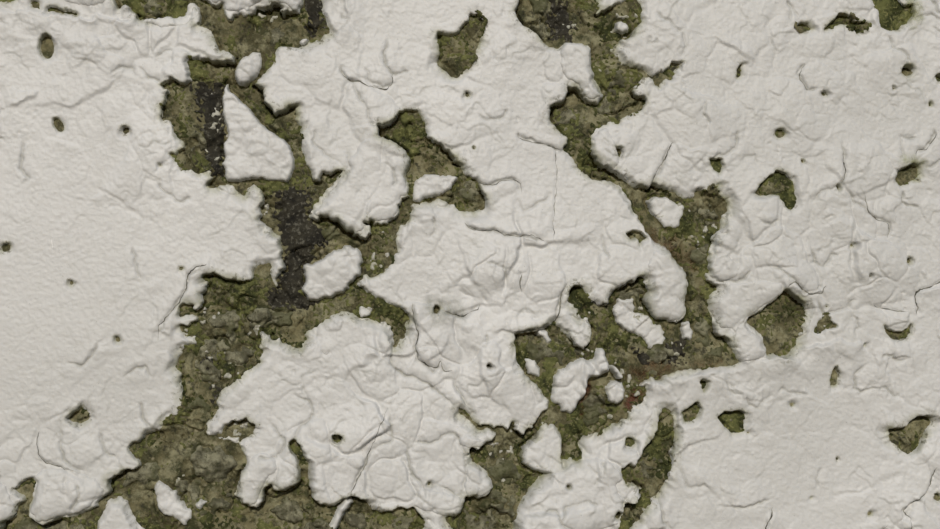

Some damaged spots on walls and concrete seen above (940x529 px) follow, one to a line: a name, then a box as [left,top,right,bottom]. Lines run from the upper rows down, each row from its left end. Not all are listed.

spalling [824,0,913,34]
crack [465,132,557,241]
spalling [6,0,488,529]
spalling [445,0,738,529]
spalling [747,291,836,356]
spalling [718,411,745,433]
spalling [888,416,931,454]